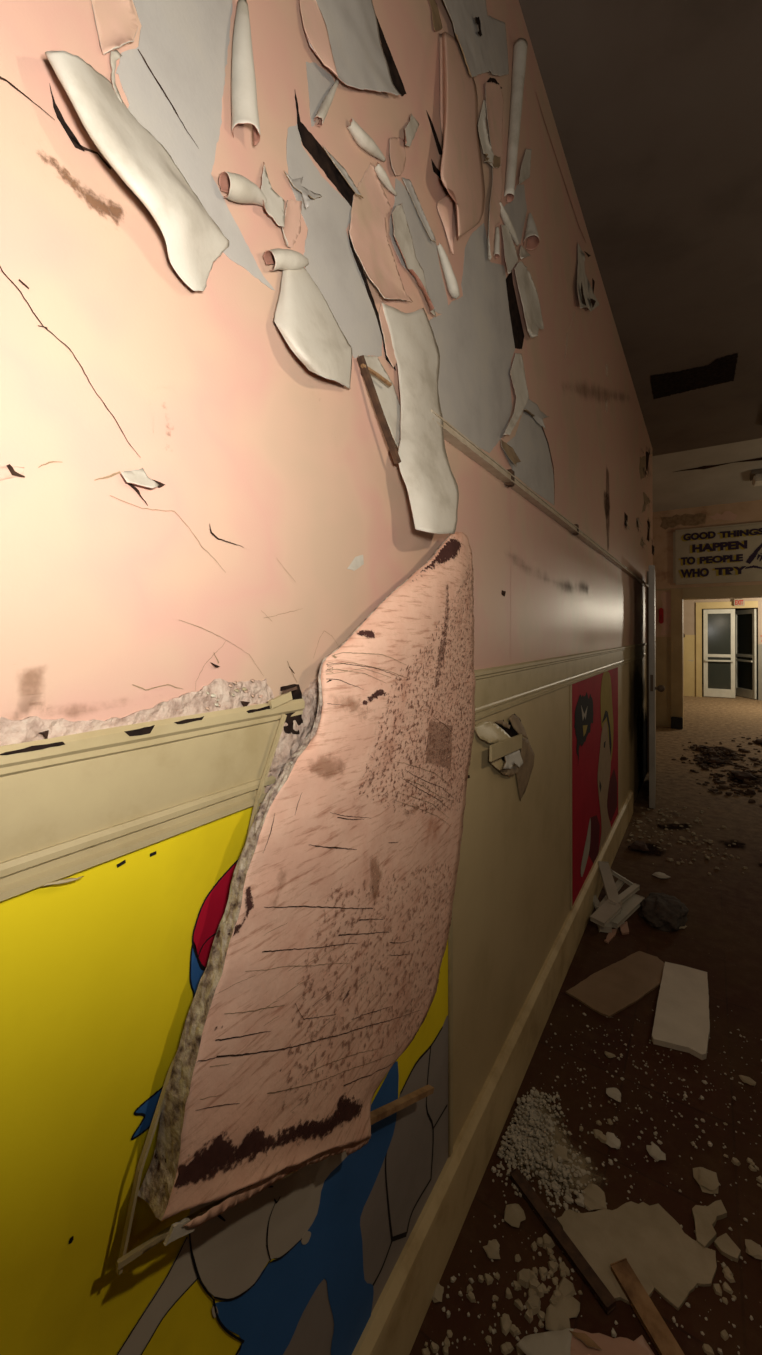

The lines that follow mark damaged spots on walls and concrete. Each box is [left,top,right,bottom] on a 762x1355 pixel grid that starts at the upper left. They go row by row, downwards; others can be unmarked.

crack [0,76,111,170]
peeling [45,0,555,534]
crack [0,266,141,458]
spalling [0,662,275,755]
spalling [258,673,319,809]
spalling [475,714,535,801]
peeling [163,1218,195,1246]